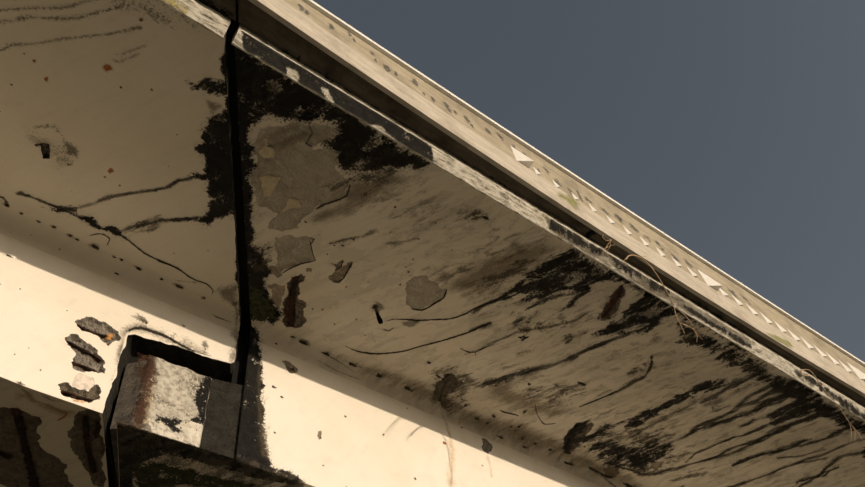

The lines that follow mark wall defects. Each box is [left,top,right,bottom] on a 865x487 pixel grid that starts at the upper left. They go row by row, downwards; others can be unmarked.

spalling [0,407,74,487]
spalling [58,316,121,487]
rust [132,355,160,429]
water stain [16,30,434,487]
peeling [251,122,352,328]
crack [325,303,494,362]
peeling [405,275,447,311]
water stain [468,213,865,487]